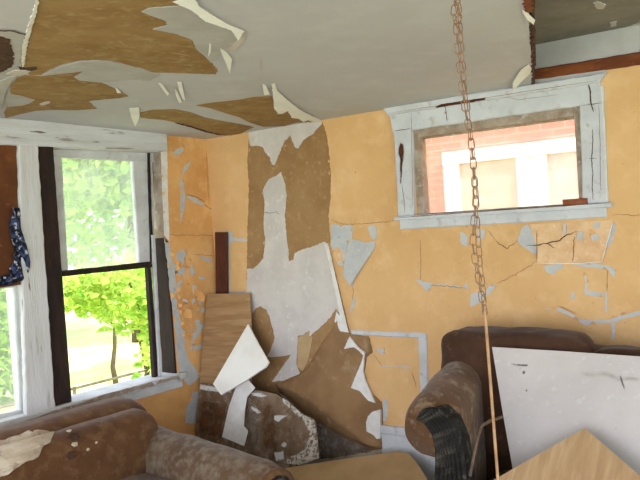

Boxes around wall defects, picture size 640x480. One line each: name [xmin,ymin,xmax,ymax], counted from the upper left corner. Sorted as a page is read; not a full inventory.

spalling [0,30,37,108]
peeling [43,60,185,103]
peeling [129,107,140,126]
flaking render [249,121,322,165]
peeling [12,147,206,425]
flaking render [228,172,389,382]
crack [488,231,575,261]
flaking render [470,214,640,340]